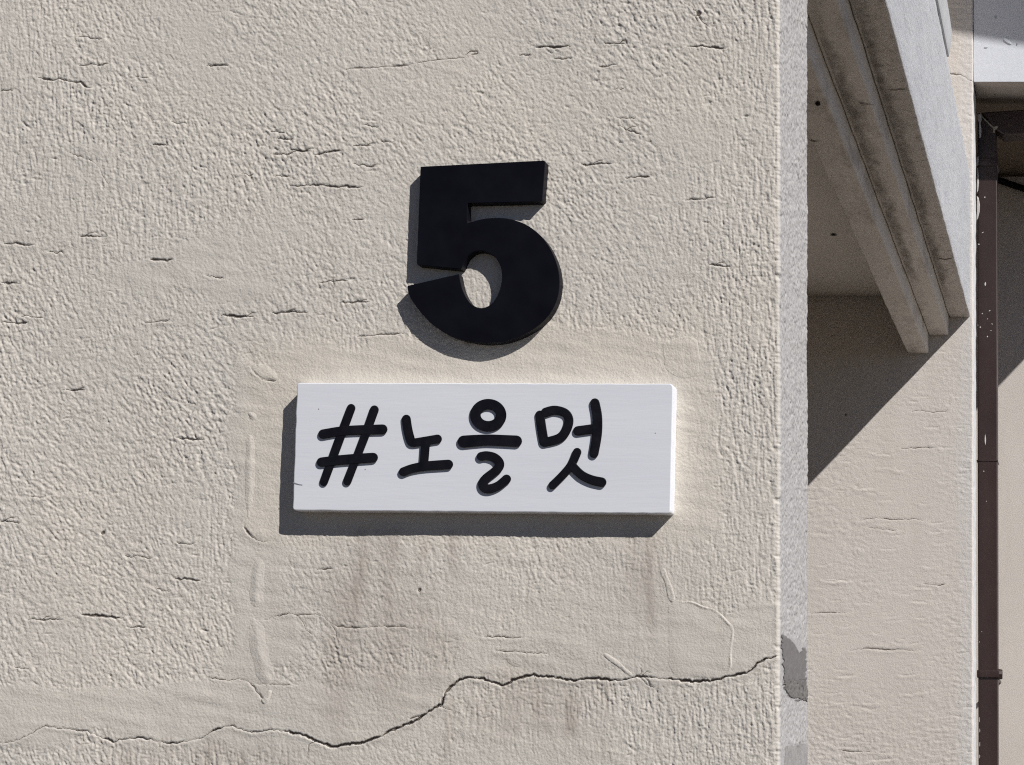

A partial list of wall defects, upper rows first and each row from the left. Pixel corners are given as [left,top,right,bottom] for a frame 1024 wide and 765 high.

crack [683,1,723,49]
crack [39,36,107,88]
crack [349,50,478,69]
crack [245,124,389,188]
crack [221,309,302,318]
crack [32,613,144,628]
crack [6,636,776,751]